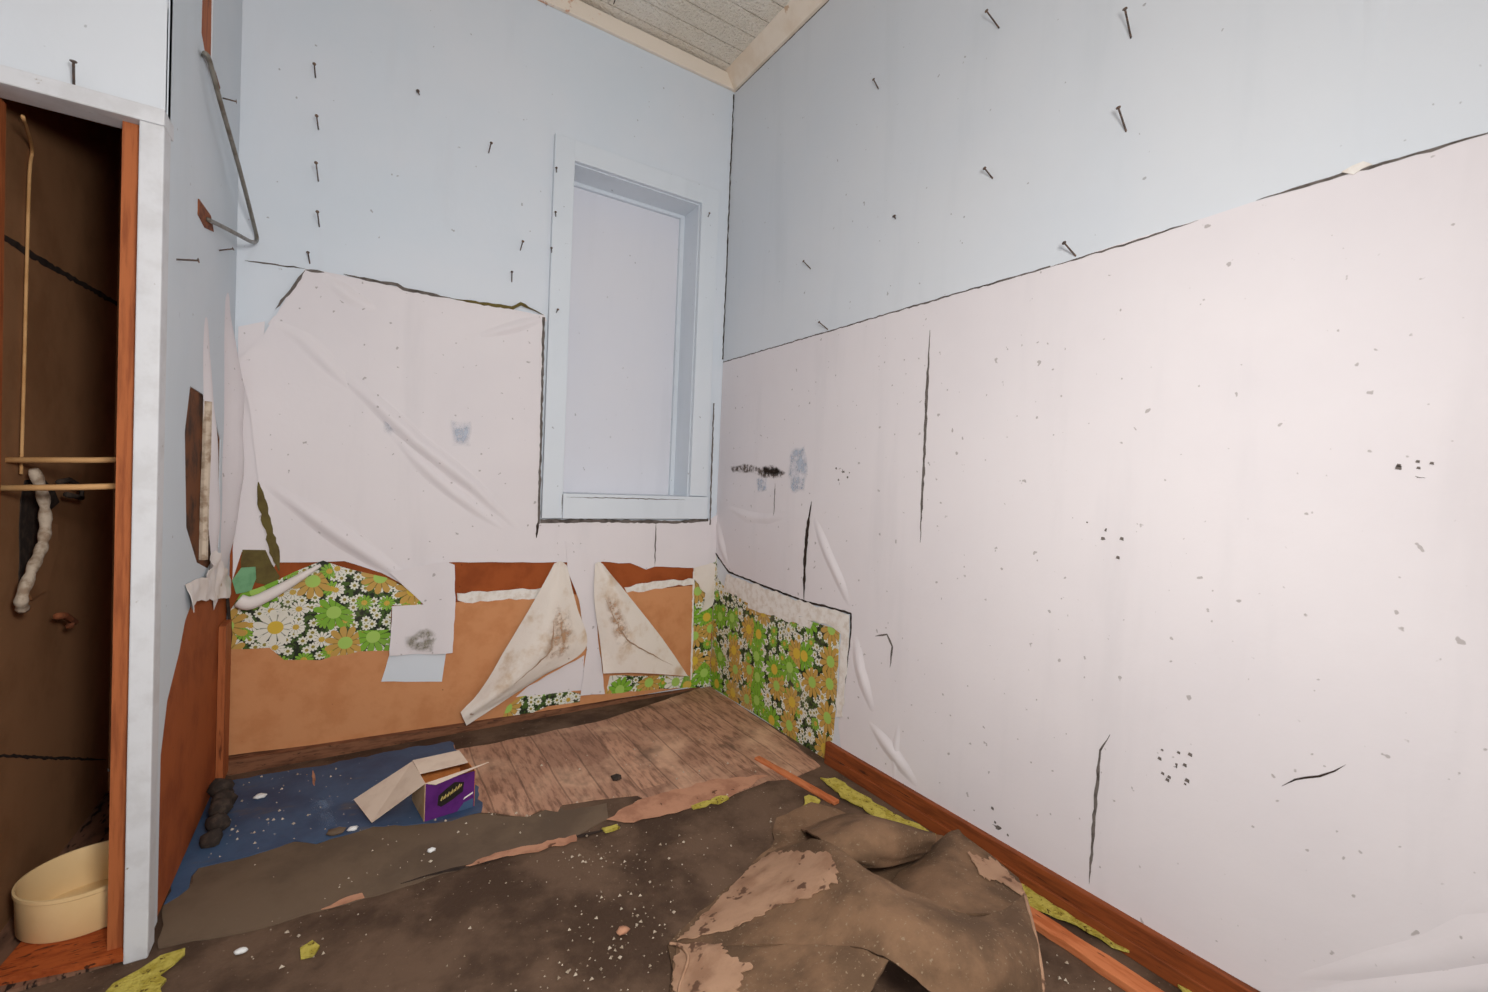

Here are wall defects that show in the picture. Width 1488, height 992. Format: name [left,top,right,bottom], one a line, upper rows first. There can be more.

crack [1256,132,1488,201]
crack [722,0,1195,541]
peeling [457,588,541,603]
peeling [624,578,694,593]
crack [1089,735,1110,883]